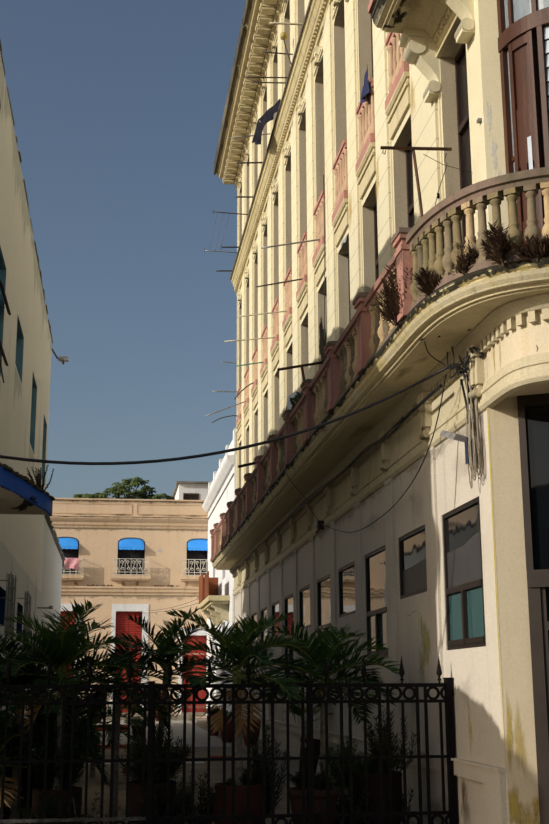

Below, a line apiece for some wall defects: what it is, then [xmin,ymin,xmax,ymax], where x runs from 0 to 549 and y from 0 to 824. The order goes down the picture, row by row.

water stain [507,710,523,758]
water stain [509,793,539,824]